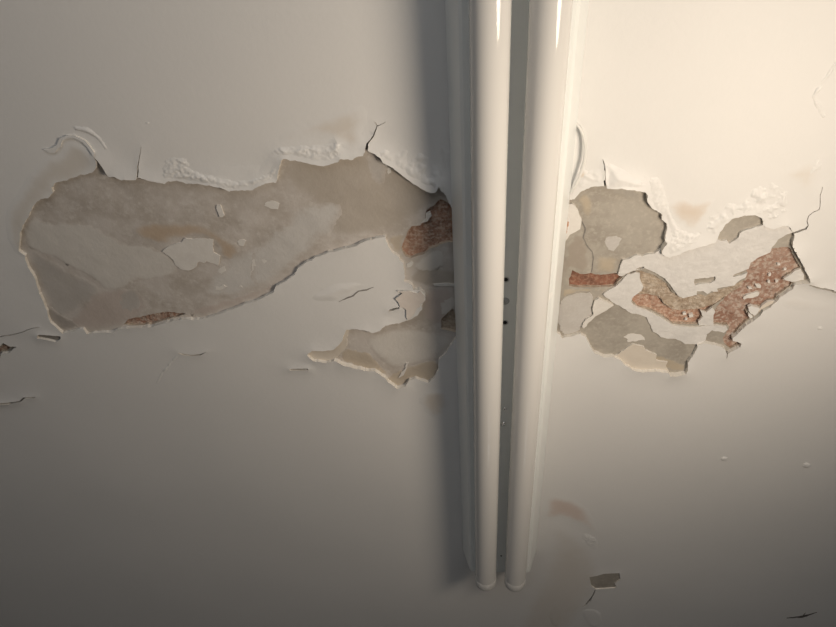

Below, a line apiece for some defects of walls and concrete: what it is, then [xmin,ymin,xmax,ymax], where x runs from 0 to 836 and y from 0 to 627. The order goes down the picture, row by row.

peeling [20,150,456,386]
peeling [557,185,808,372]
peeling [589,573,620,588]